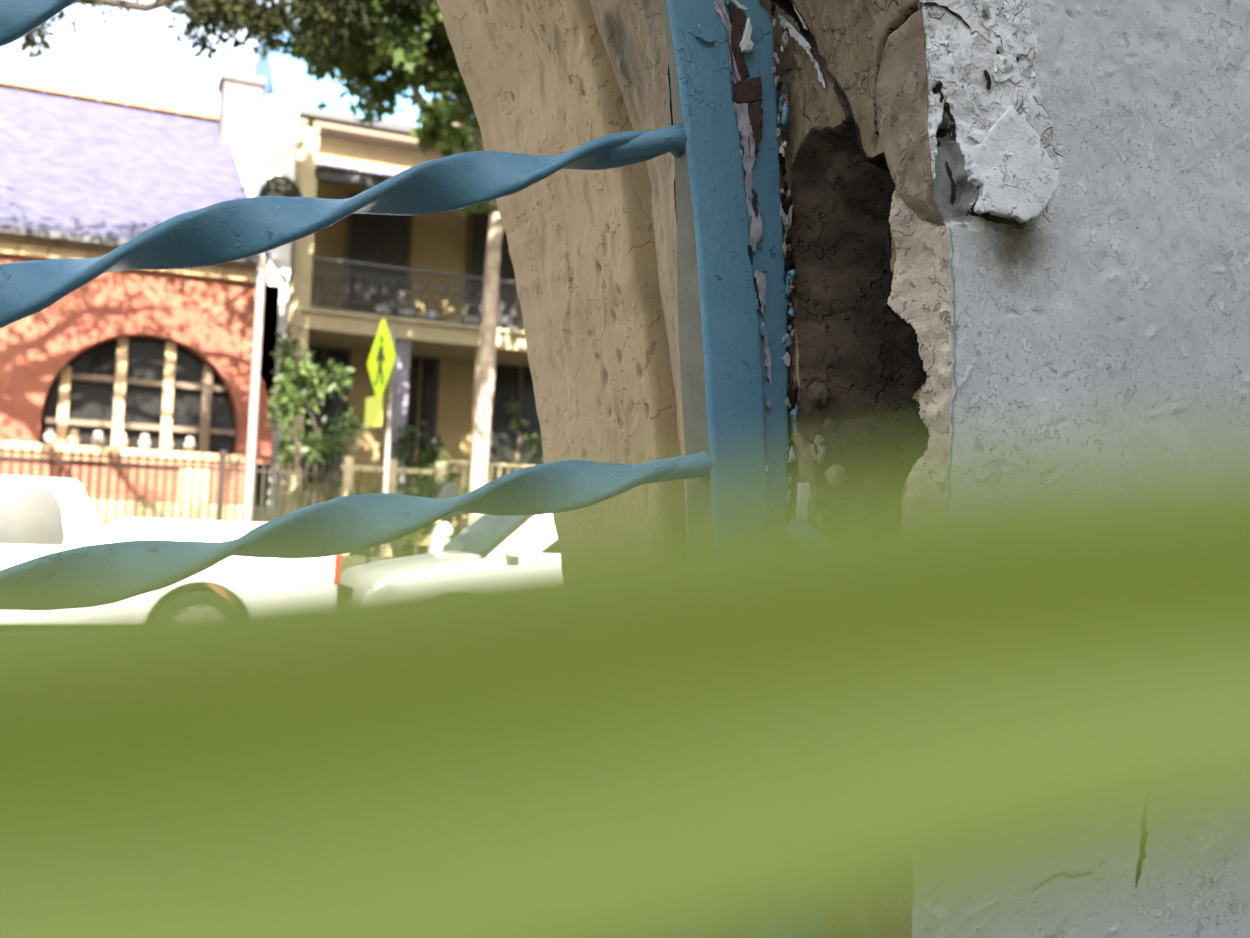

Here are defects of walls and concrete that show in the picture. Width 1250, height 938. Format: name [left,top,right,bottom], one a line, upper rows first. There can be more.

spalling [696,0,1063,483]